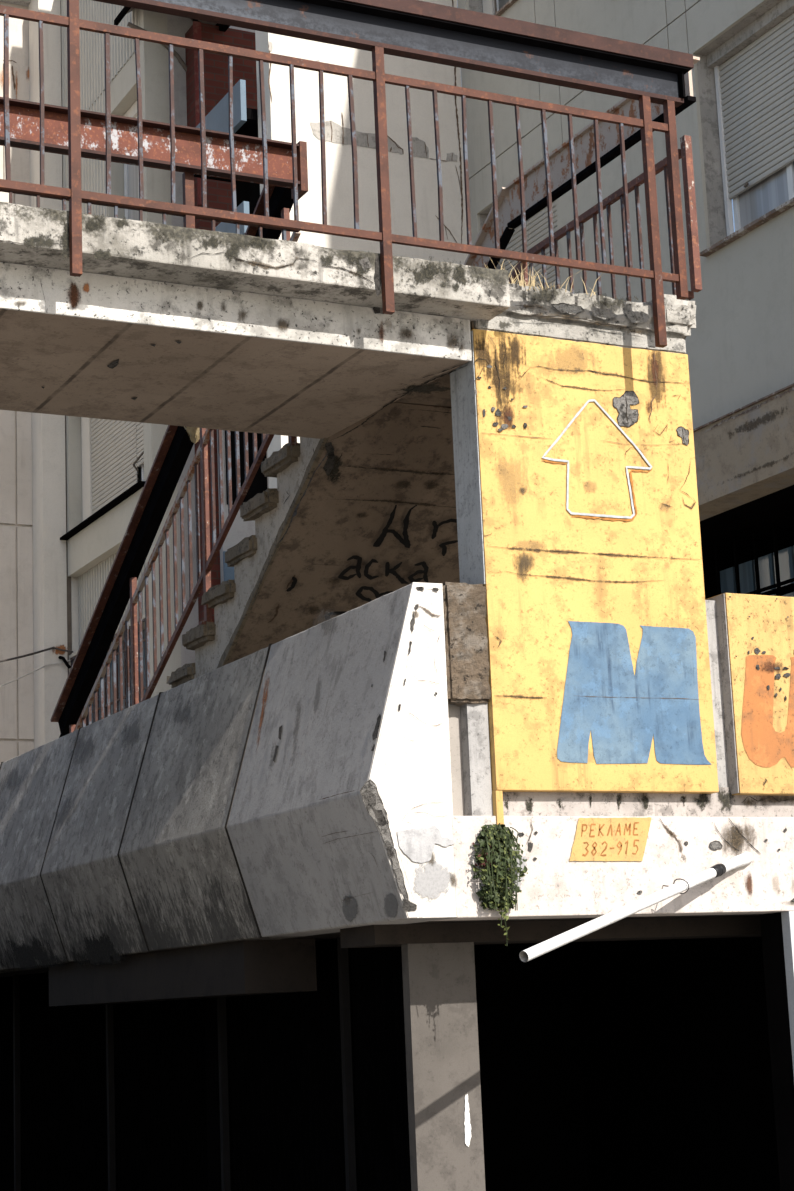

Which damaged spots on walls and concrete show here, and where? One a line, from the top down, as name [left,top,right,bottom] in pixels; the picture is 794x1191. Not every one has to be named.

peeling [310,115,458,162]
spalling [360,780,417,911]